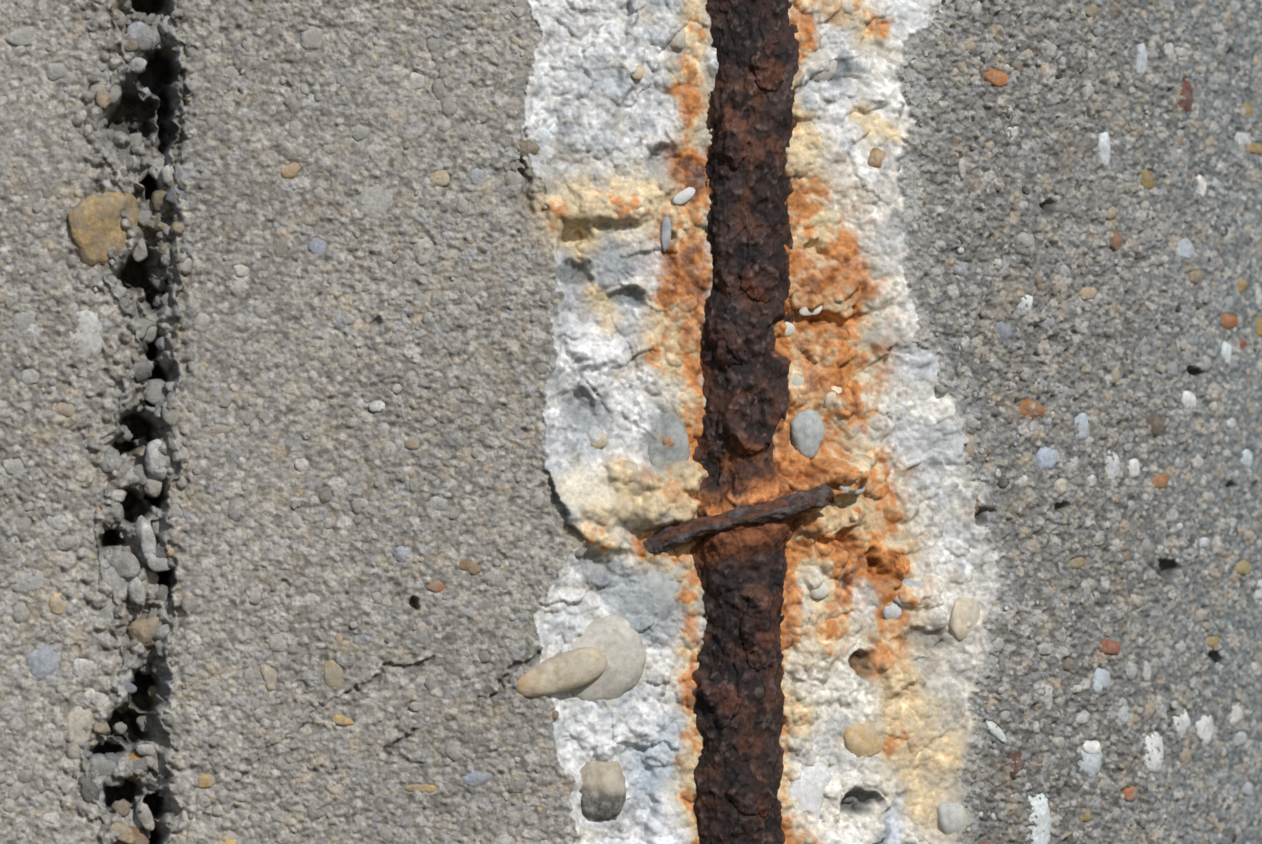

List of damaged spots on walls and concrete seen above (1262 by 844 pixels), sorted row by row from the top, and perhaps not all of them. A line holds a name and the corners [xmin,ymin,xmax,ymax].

crack [67,0,196,844]
spalling [517,0,719,844]
spalling [774,0,1004,844]